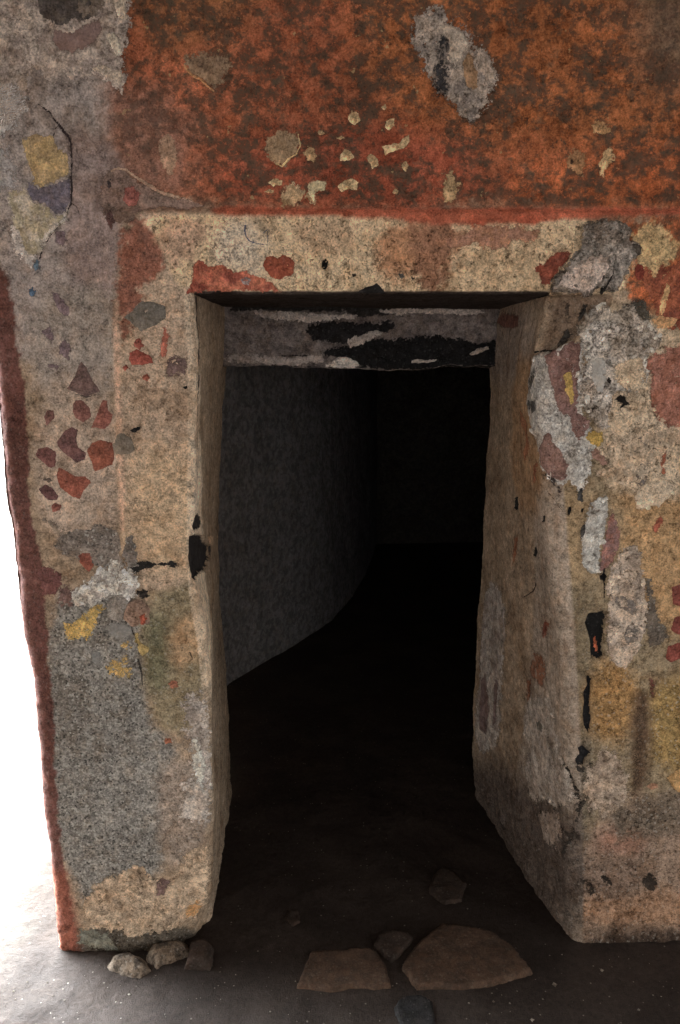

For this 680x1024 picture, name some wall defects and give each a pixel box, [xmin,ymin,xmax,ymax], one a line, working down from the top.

flaking render [410,4,500,128]
crack [38,104,84,297]
peeling [227,329,382,369]
peeling [254,310,358,323]
peeling [379,308,485,316]
spalling [188,513,213,580]